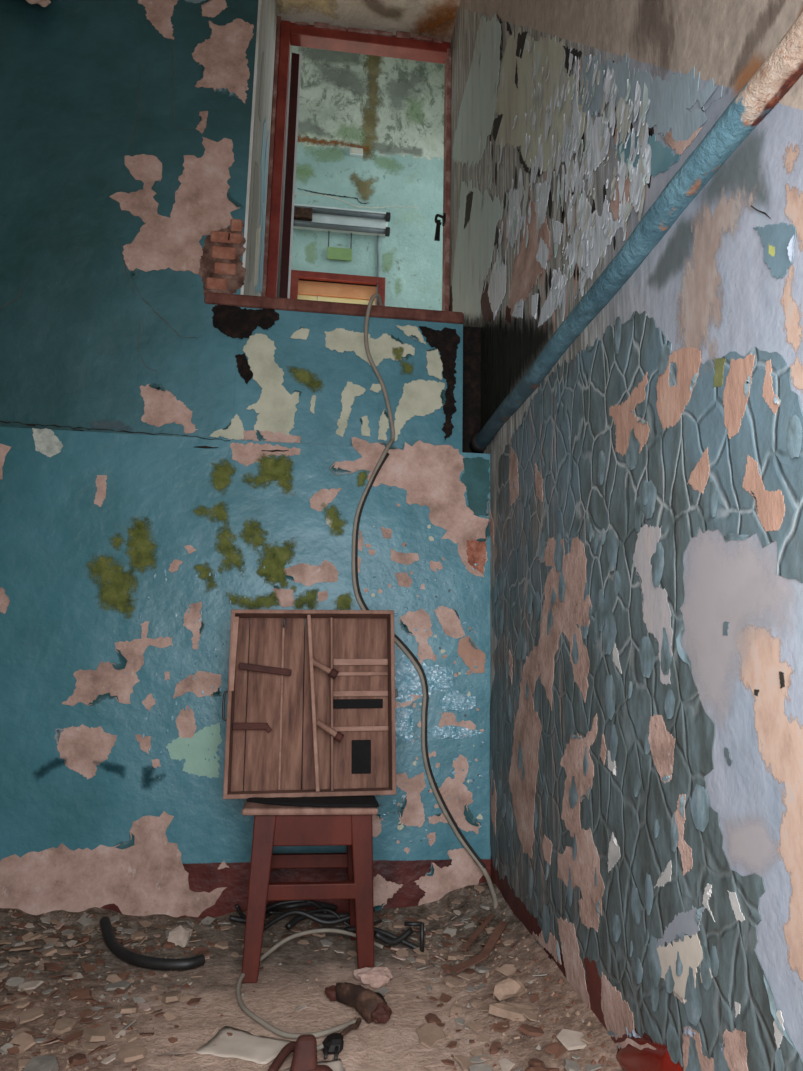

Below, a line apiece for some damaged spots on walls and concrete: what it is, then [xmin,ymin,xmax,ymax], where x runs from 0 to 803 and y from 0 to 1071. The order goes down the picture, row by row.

leakage [366,0,400,18]
peeling [109,0,269,295]
peeling [449,14,723,346]
peeling [140,383,198,434]
peeling [209,334,316,466]
mould [88,518,157,618]
mould [193,456,318,609]
mould [322,505,347,536]
mould [335,594,352,610]
mould [357,471,368,487]
peeling [310,142,803,1071]
peeling [0,811,227,917]